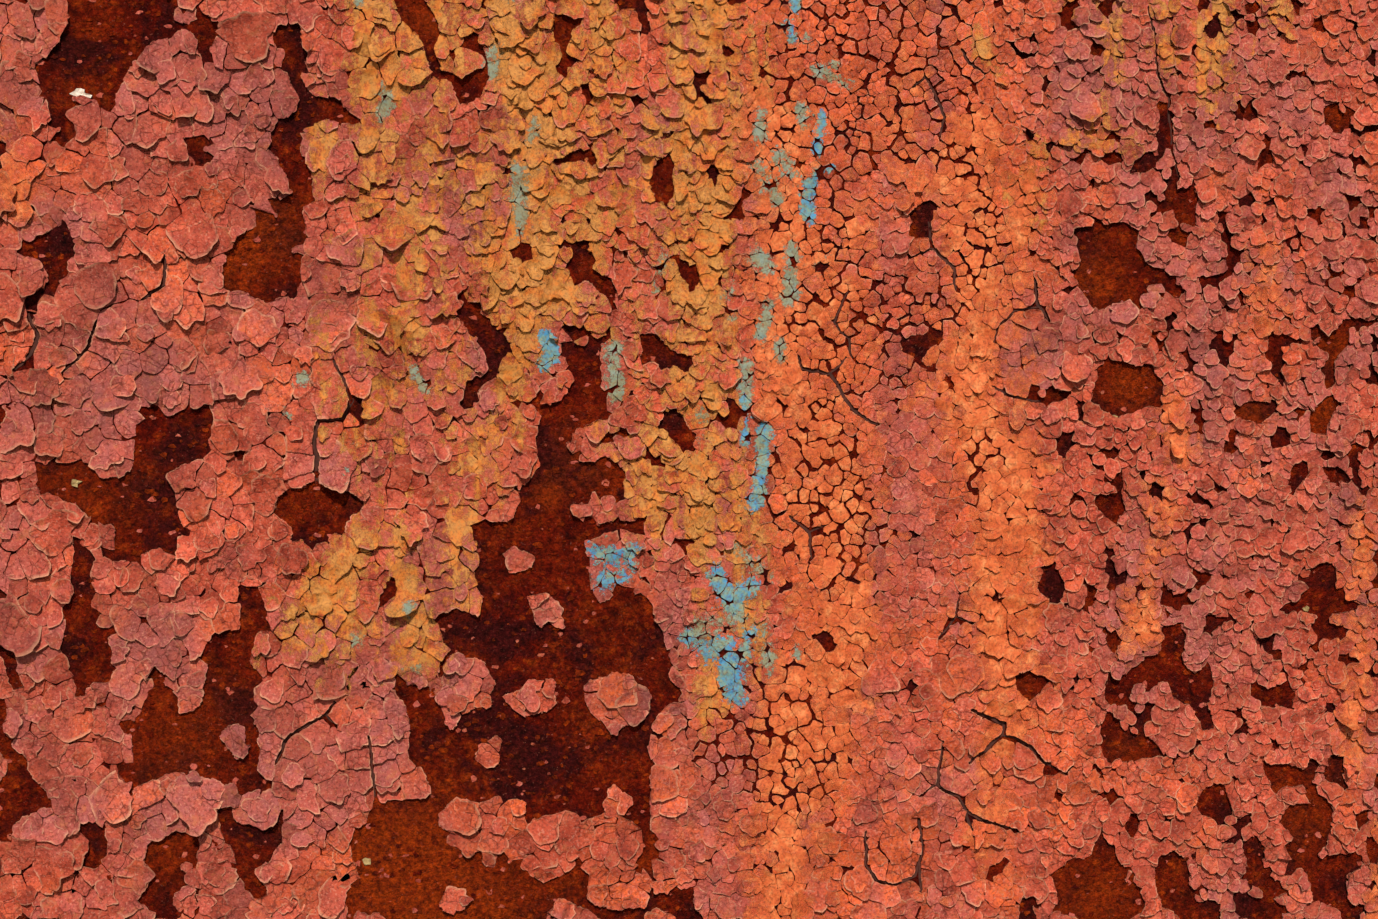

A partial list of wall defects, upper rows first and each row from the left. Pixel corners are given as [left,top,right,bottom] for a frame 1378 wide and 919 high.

rust [1258,0,1295,40]
crack [913,76,945,136]
rust [0,116,34,220]
crack [914,222,957,291]
crack [797,291,878,425]
crack [993,279,1048,343]
rust [253,0,897,919]
rust [859,0,1242,883]
crack [789,516,828,559]
rust [1330,499,1378,771]
peeling [750,732,785,791]
crack [864,709,1056,892]